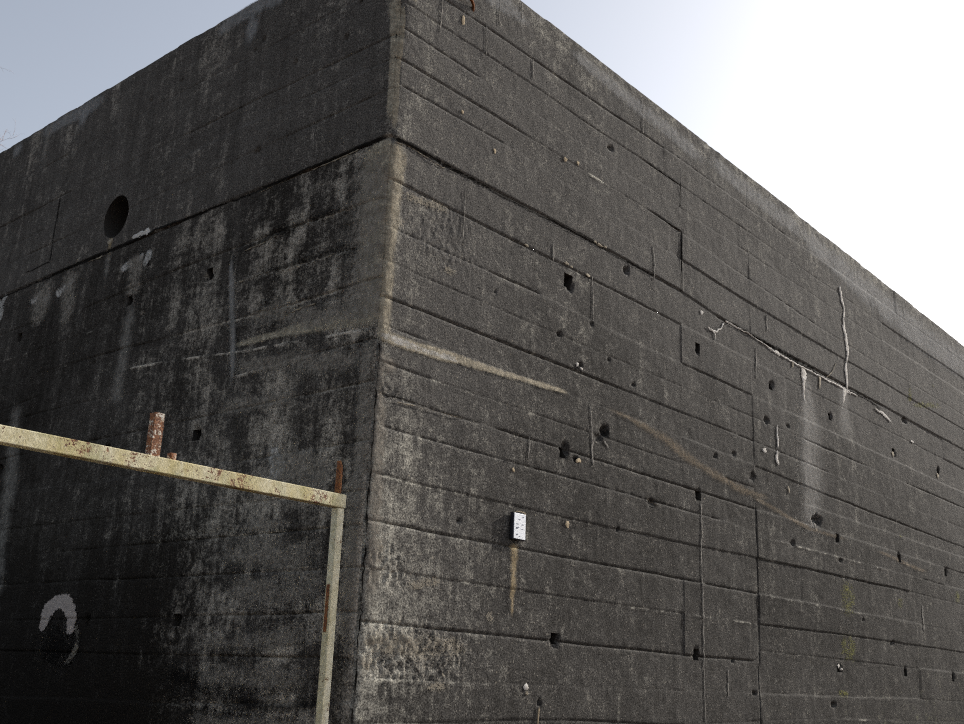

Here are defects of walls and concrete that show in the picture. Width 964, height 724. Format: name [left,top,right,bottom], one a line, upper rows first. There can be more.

water stain [31,271,77,324]
water stain [121,250,152,295]
crack [707,286,891,422]